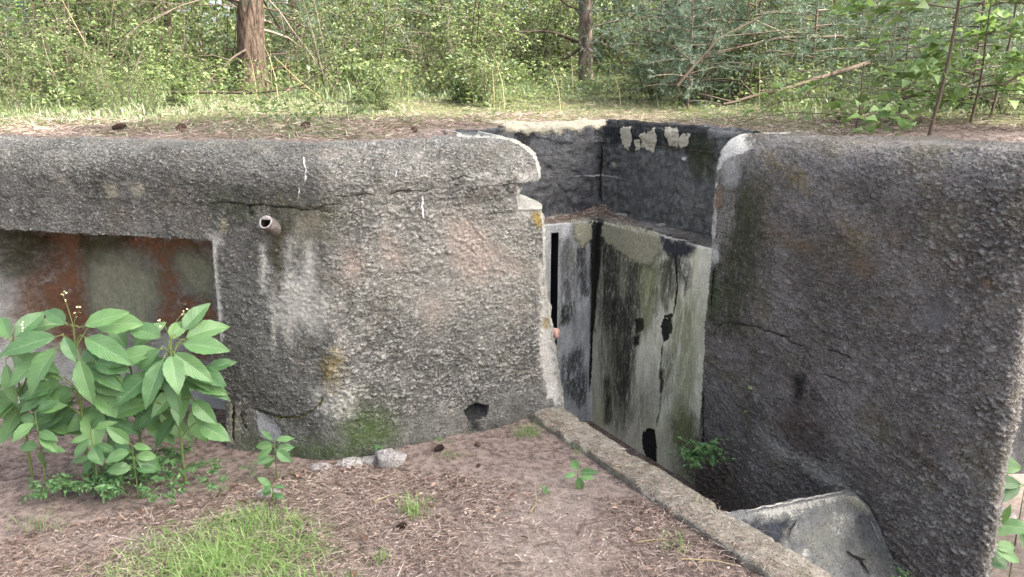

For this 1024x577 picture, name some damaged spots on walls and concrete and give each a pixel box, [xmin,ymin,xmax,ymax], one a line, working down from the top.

crack [217,175,471,216]
corrosion [21,232,96,349]
corrosion [116,235,217,335]
water stain [261,211,327,341]
flaking render [446,119,691,408]
water stain [562,348,587,407]
water stain [577,246,588,296]
water stain [603,246,632,425]
flaking render [642,256,678,462]
water stain [660,253,687,310]